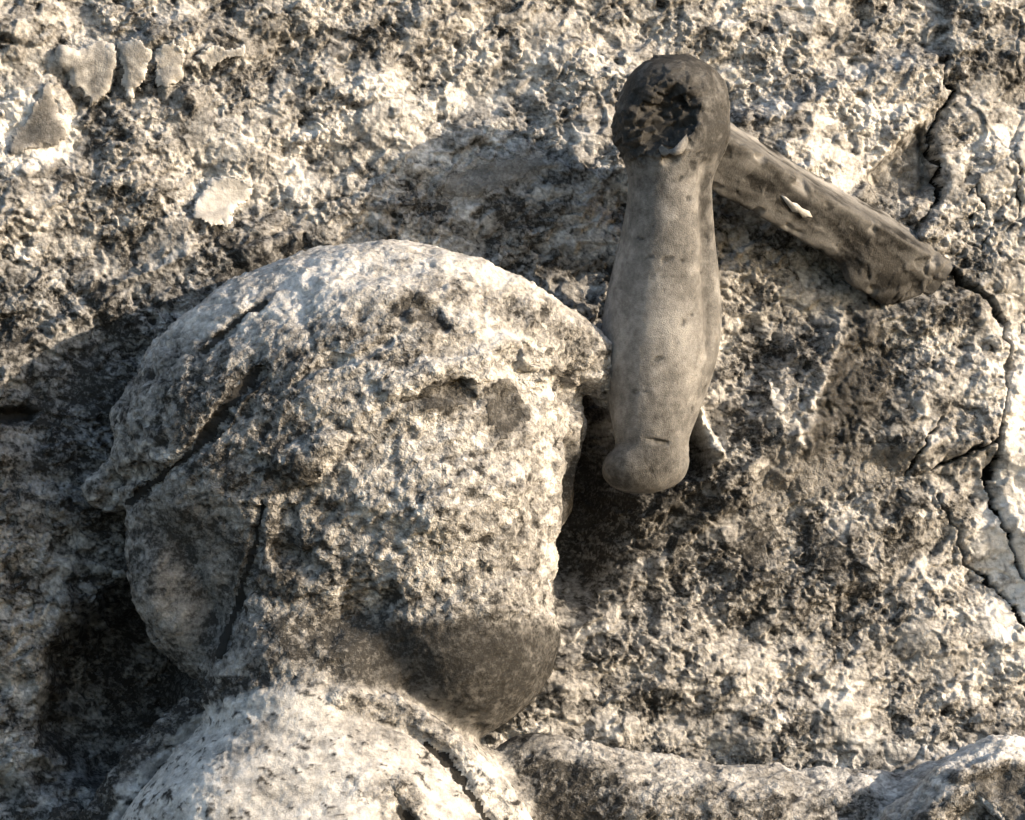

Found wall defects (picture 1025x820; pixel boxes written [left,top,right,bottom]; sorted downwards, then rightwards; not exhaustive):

crack [923,79,956,208]
crack [963,185,989,250]
crack [215,504,265,659]
crack [909,409,1025,627]
crack [423,741,491,820]